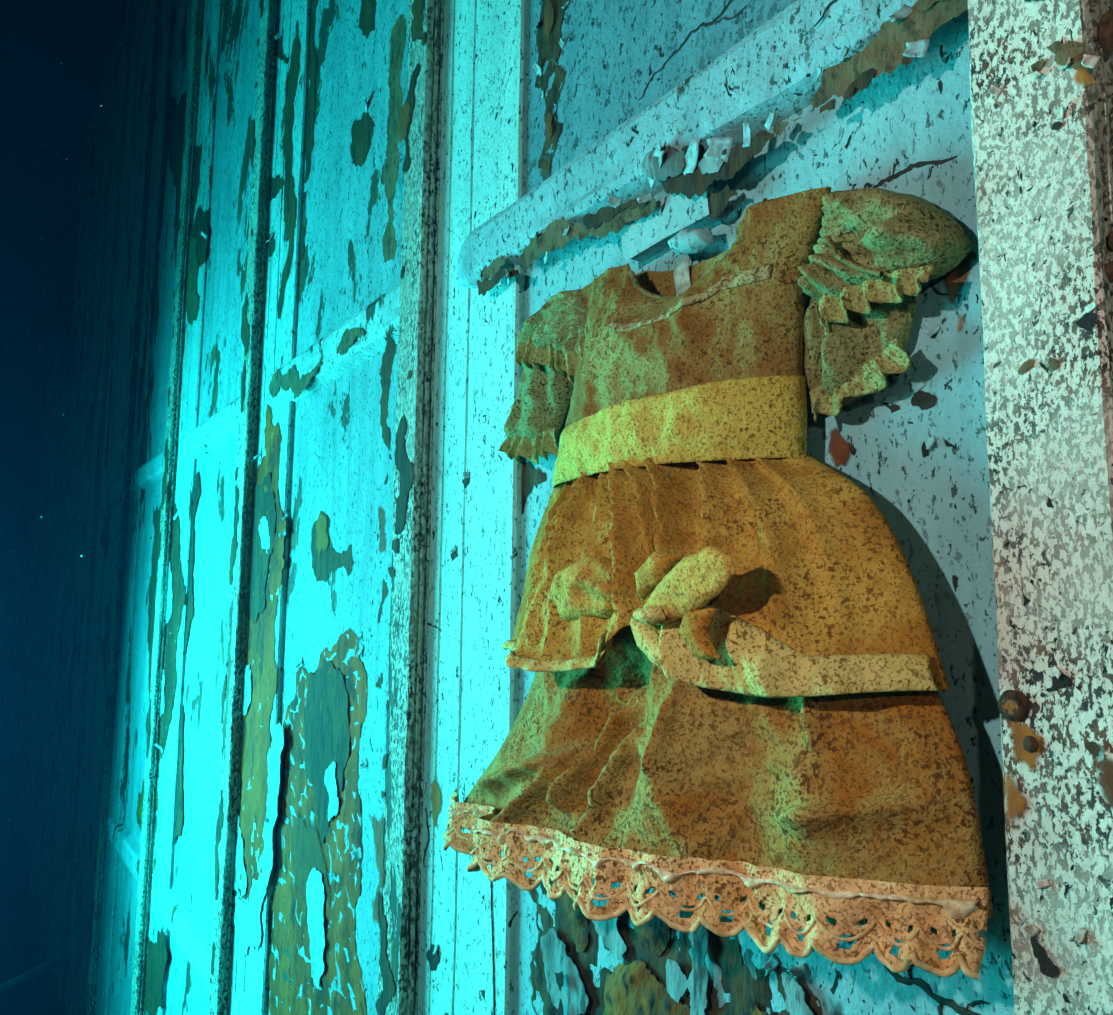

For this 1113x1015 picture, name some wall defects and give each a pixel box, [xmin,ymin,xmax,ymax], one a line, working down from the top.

crack [639,0,747,100]
crack [814,0,837,27]
peeling [811,0,968,113]
peeling [266,0,318,319]
peeling [350,96,373,167]
peeling [477,110,801,296]
peeling [141,472,200,844]
peeling [233,355,368,1015]
rust [1005,775,1025,825]
rust [1008,721,1040,770]
rust [1085,741,1113,808]
peeling [529,858,822,1015]